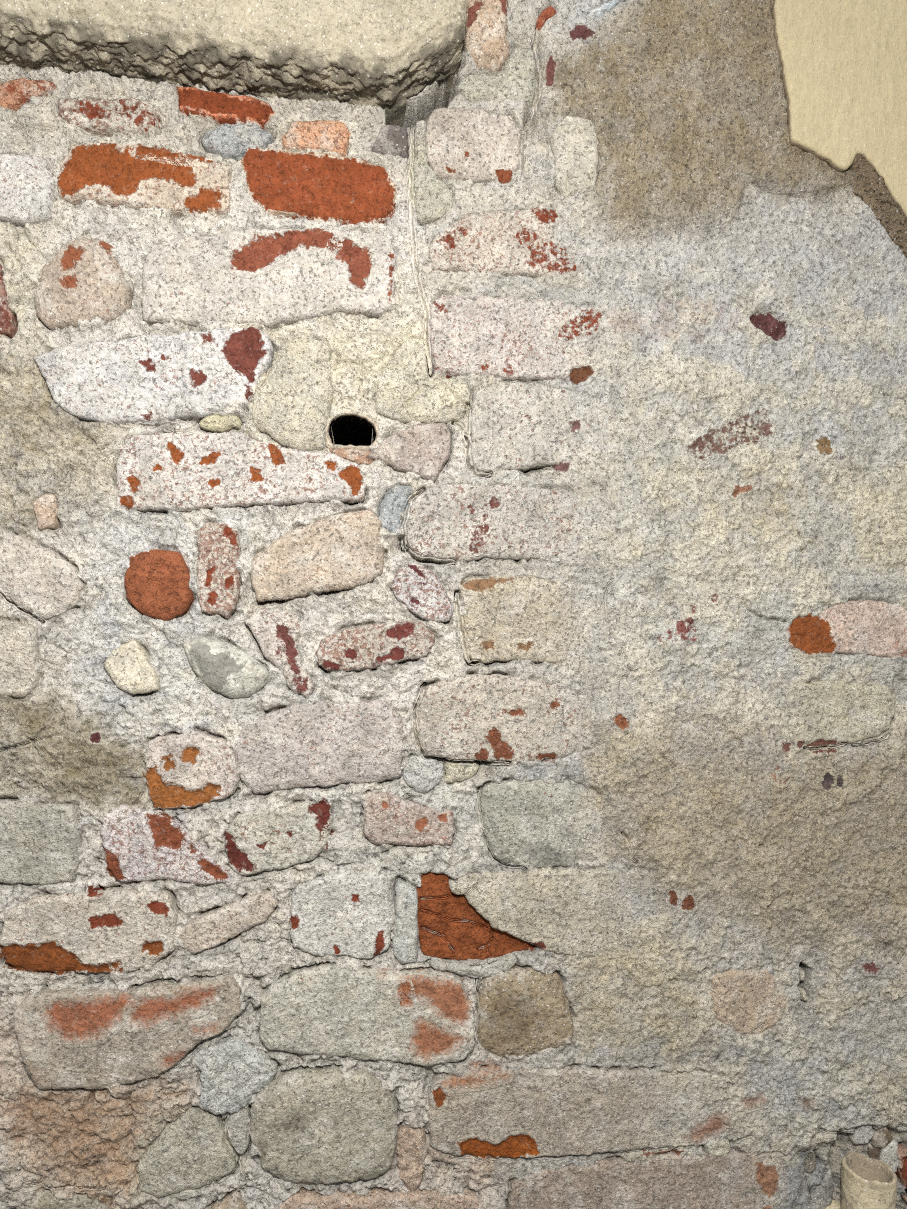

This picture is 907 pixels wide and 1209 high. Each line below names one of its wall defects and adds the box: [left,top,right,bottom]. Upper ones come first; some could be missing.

flaking render [771,0,907,258]
spalling [894,1142,907,1196]